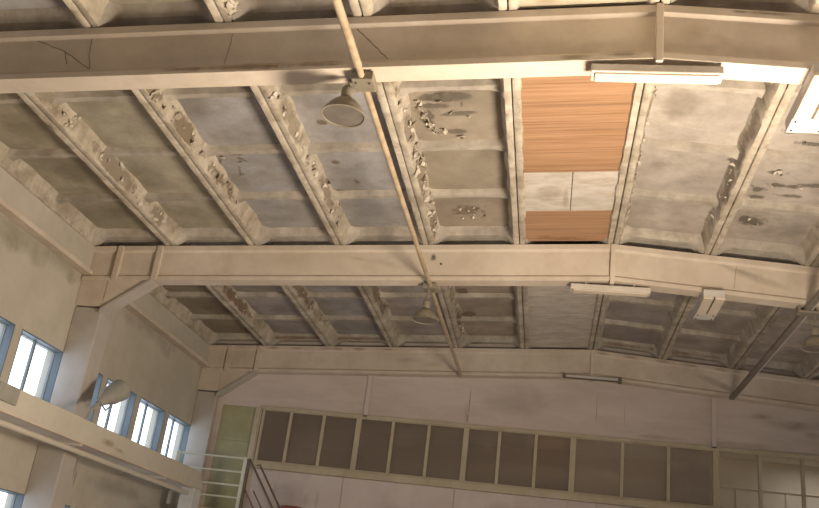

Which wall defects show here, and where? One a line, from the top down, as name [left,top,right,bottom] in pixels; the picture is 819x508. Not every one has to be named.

peeling [226,0,242,17]
crack [38,39,93,69]
peeling [147,89,194,145]
peeling [93,142,143,206]
peeling [303,145,343,227]
peeling [395,88,474,238]